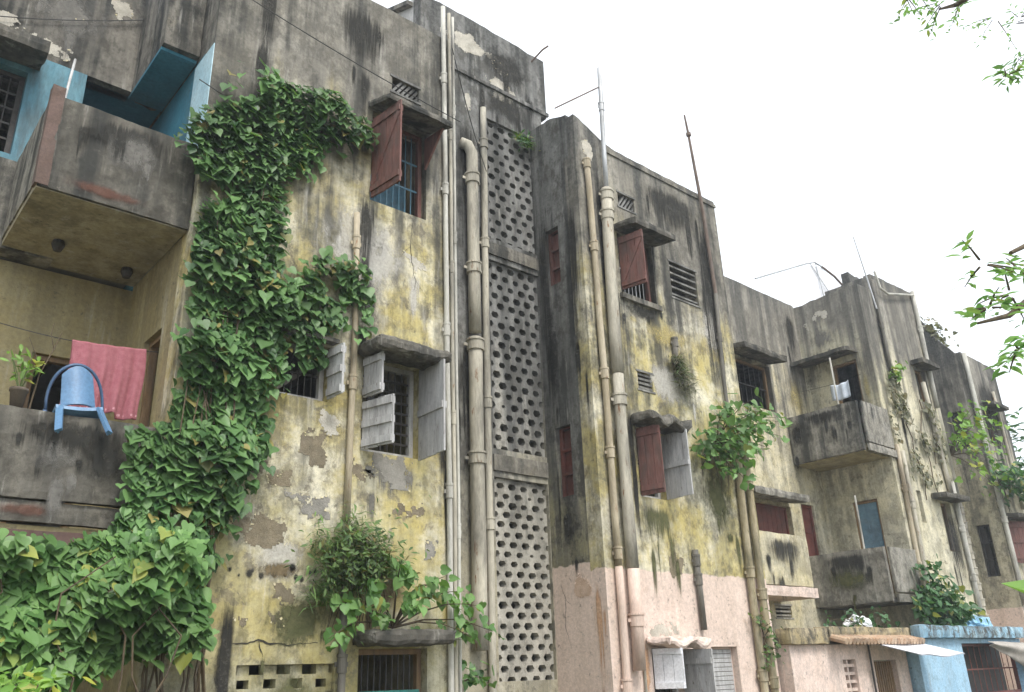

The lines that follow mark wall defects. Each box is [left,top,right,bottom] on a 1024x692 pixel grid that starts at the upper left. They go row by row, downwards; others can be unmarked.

peeling [0,10,73,62]
peeling [111,0,134,20]
peeling [440,27,515,103]
leakage [596,179,606,291]
leakage [646,189,726,377]
efflorescence [651,368,696,419]
peeling [298,409,340,468]
peeling [229,512,287,549]
peeling [259,461,330,526]
leakage [626,411,681,591]
leakage [766,539,798,597]
crack [232,639,318,654]